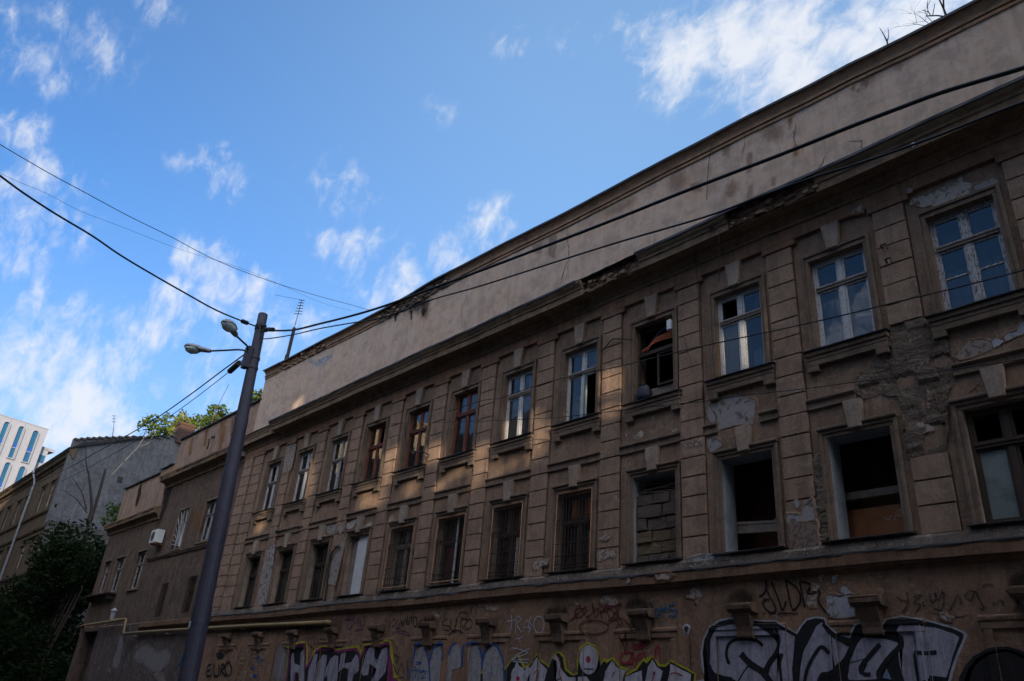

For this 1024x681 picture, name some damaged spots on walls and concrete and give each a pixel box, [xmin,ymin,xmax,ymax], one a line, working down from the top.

flaking render [906,174,1001,209]
flaking render [953,319,1024,362]
flaking render [685,394,758,454]
flaking render [785,453,832,545]
flaking render [804,574,857,620]